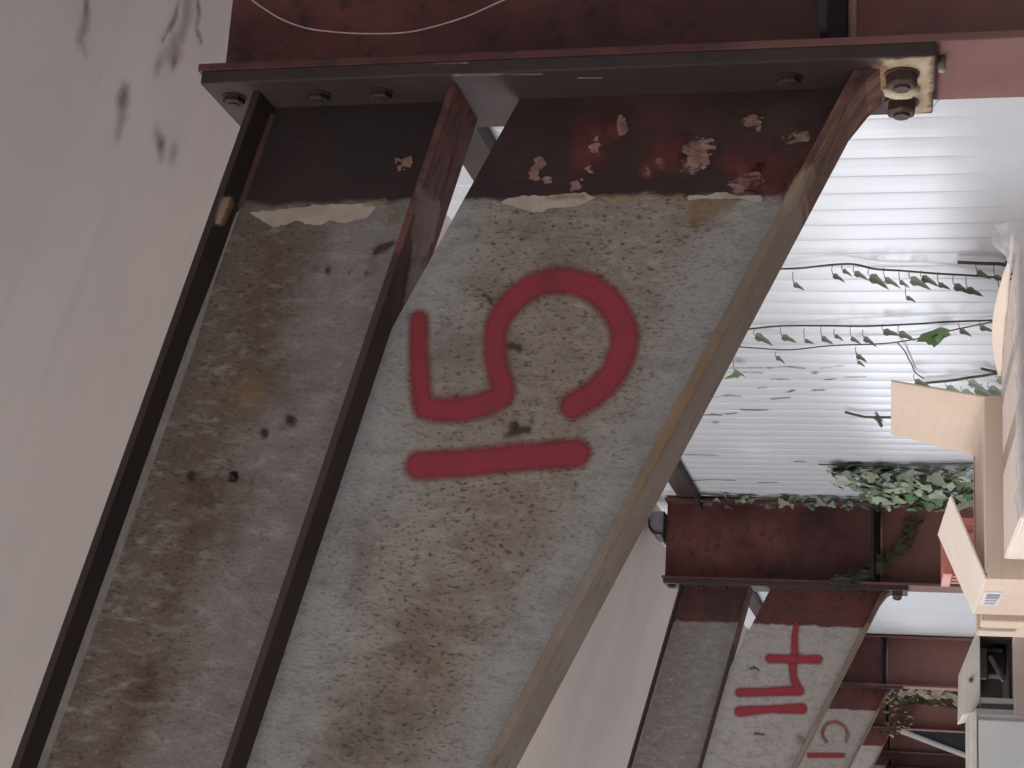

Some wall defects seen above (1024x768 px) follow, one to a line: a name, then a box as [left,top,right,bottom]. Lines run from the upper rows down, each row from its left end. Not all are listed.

peeling [502,115,683,213]
peeling [640,137,716,179]
peeling [250,201,396,228]